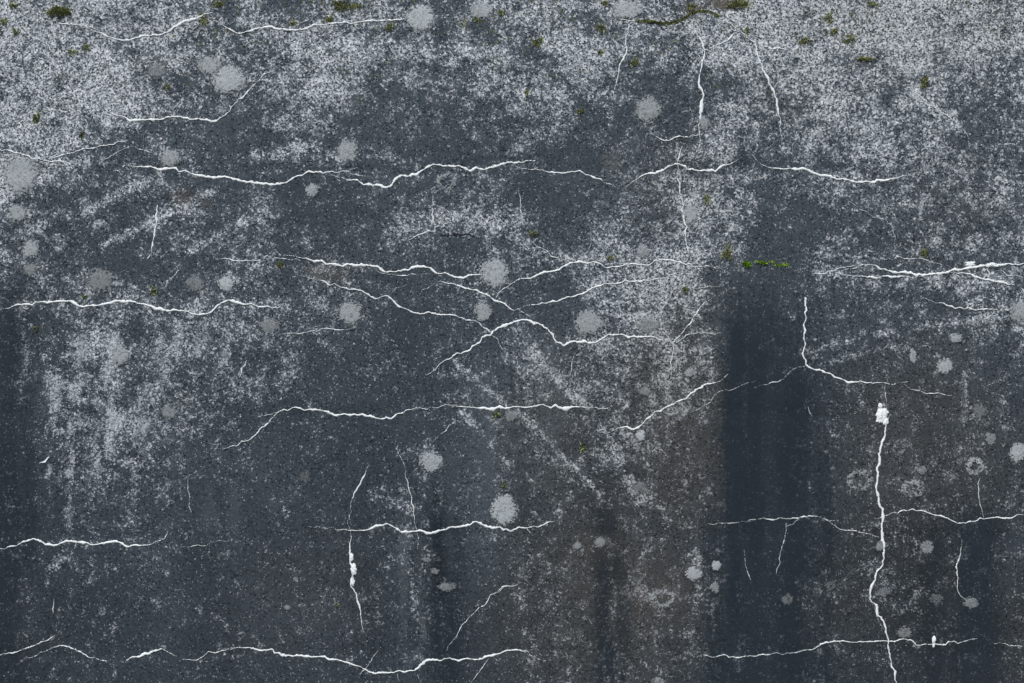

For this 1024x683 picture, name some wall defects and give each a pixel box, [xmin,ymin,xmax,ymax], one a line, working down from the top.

crack [0,5,1023,375]
crack [0,446,555,682]
crack [224,297,1021,683]
leakage [875,403,889,426]